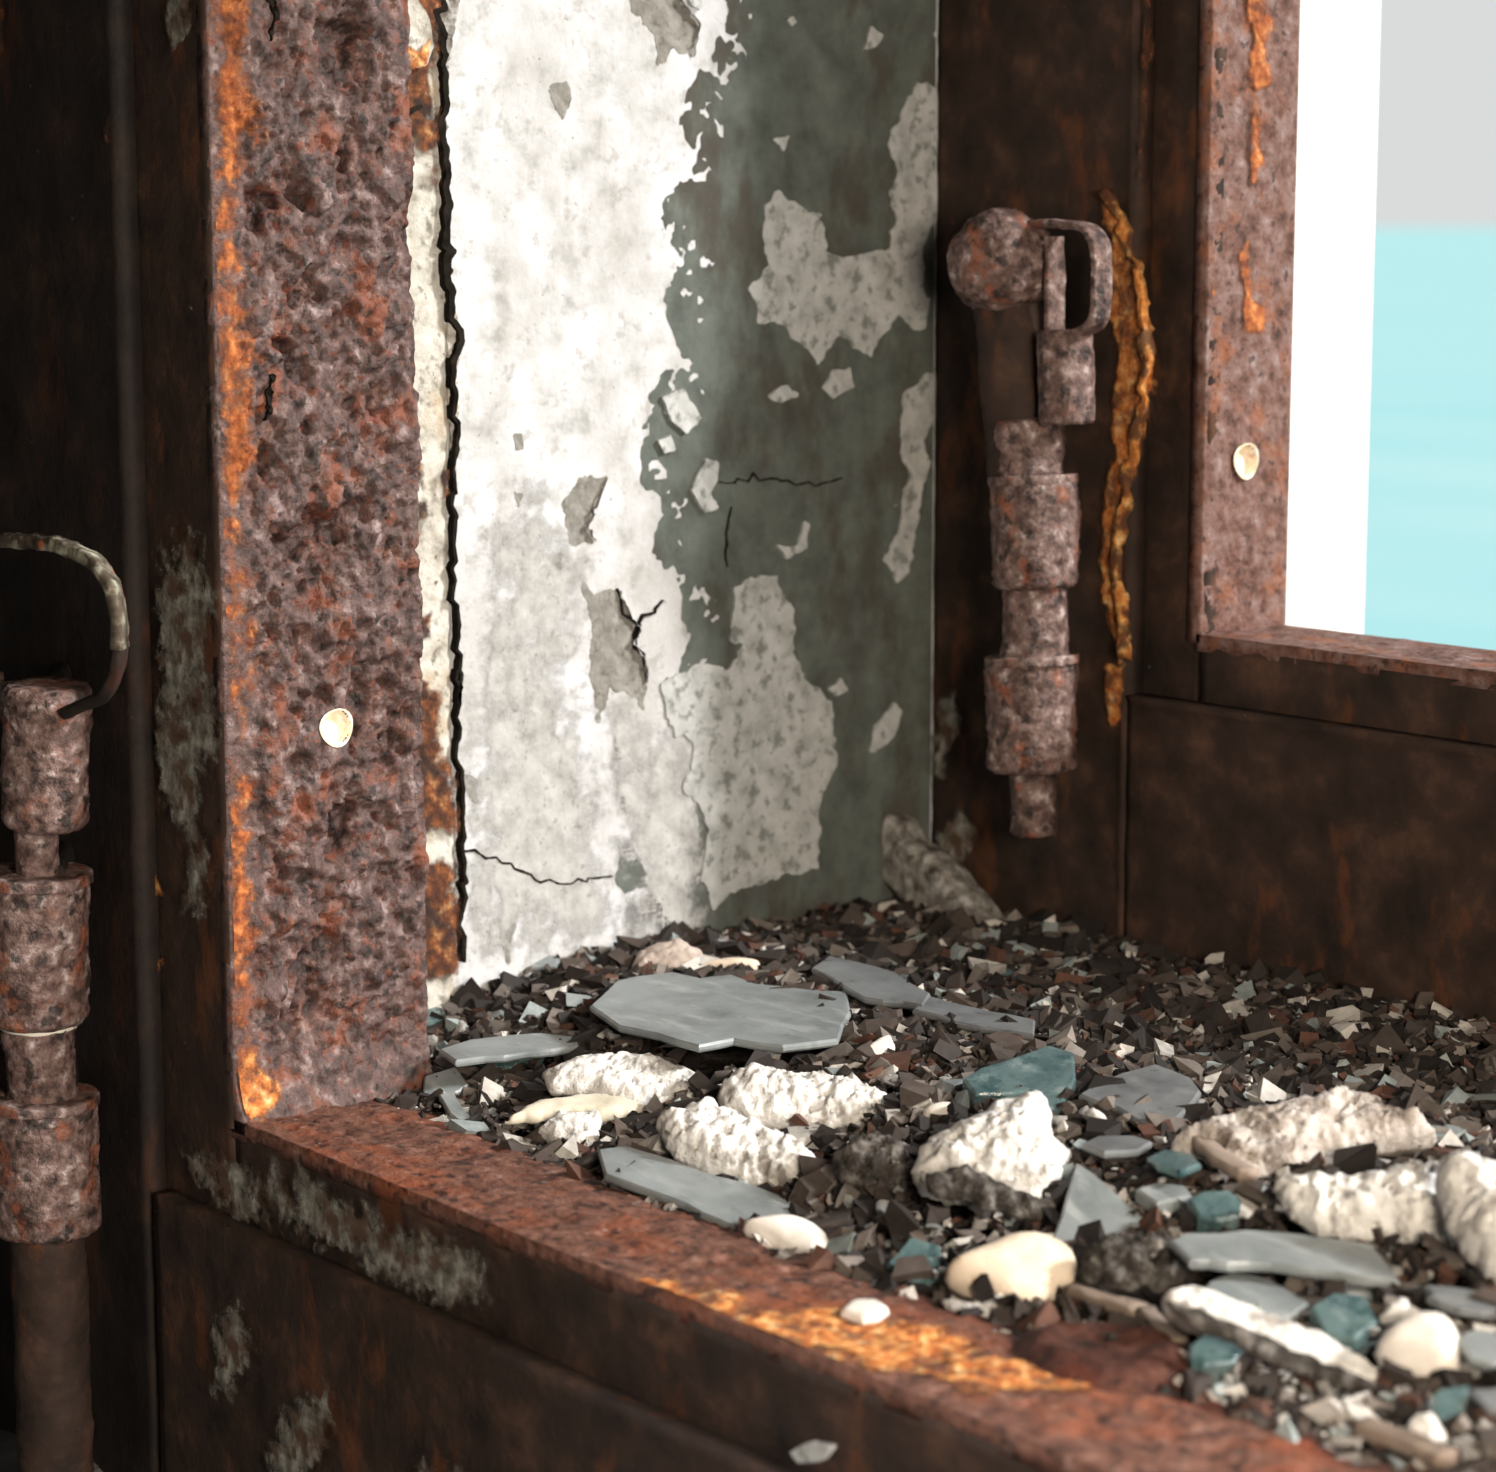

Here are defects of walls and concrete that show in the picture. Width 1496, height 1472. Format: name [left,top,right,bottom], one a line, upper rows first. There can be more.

rust [408,0,442,185]
peeling [548,81,572,119]
rust [216,0,268,543]
crack [409,0,613,963]
peeling [557,475,608,559]
peeling [581,0,1006,933]
rust [1098,187,1156,726]
rust [418,681,459,836]
rust [425,857,459,981]
rust [238,1049,280,1119]
rust [639,1278,1190,1400]
leakage [265,1391,332,1472]